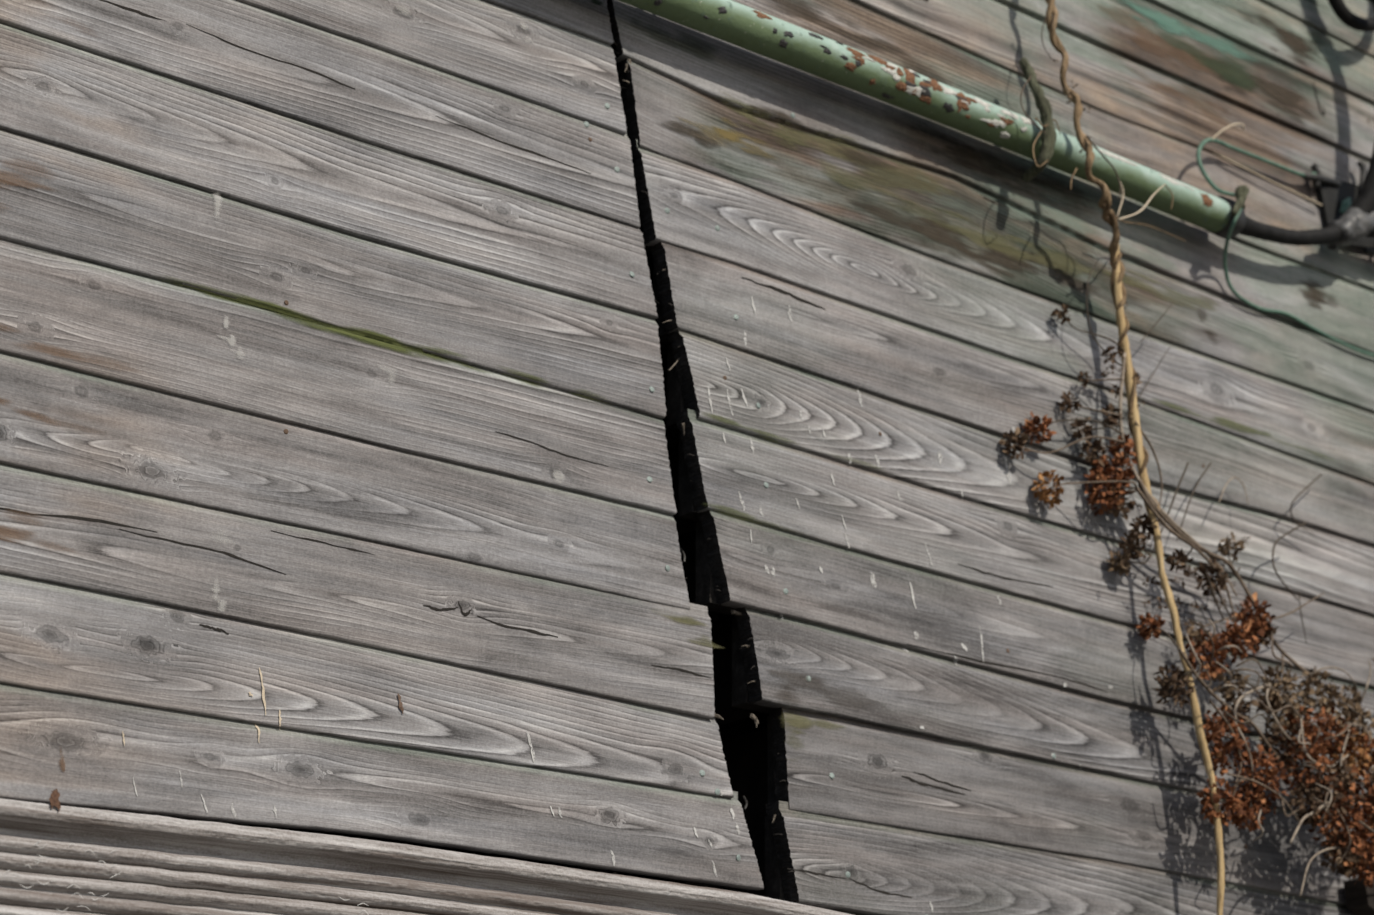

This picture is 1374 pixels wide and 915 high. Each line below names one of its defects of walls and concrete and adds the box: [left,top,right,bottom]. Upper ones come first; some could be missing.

crack [607,0,799,903]
rust [844,47,976,119]